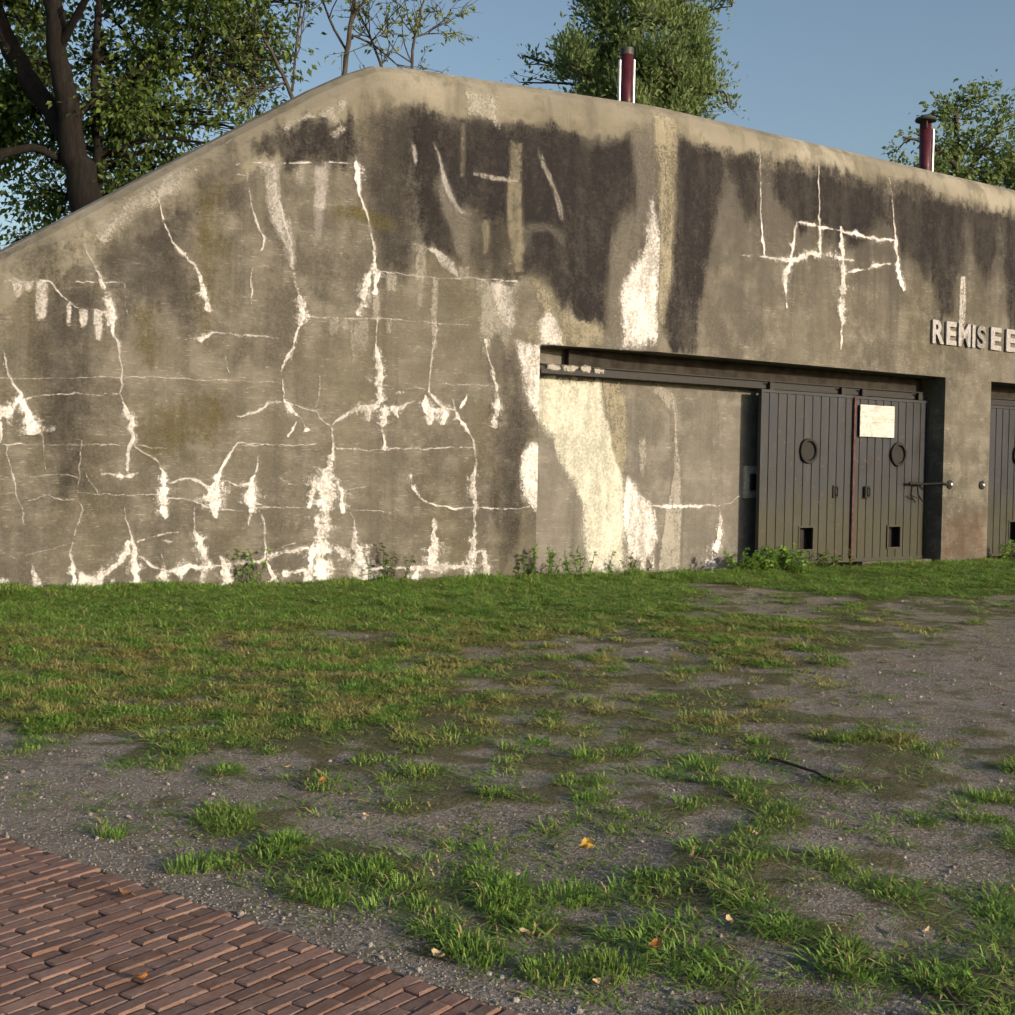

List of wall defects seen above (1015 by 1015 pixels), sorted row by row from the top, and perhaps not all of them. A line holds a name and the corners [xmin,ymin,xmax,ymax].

water stain [257,113,355,171]
crack [0,361,41,445]
crack [39,273,117,335]
efflorescence [67,306,111,340]
crack [70,197,511,585]
crack [354,161,381,316]
water stain [412,107,758,419]
crack [760,180,905,347]
water stain [773,160,1015,330]
efflorescence [78,573,115,587]
efflorescence [622,407,681,570]
crack [648,504,723,570]